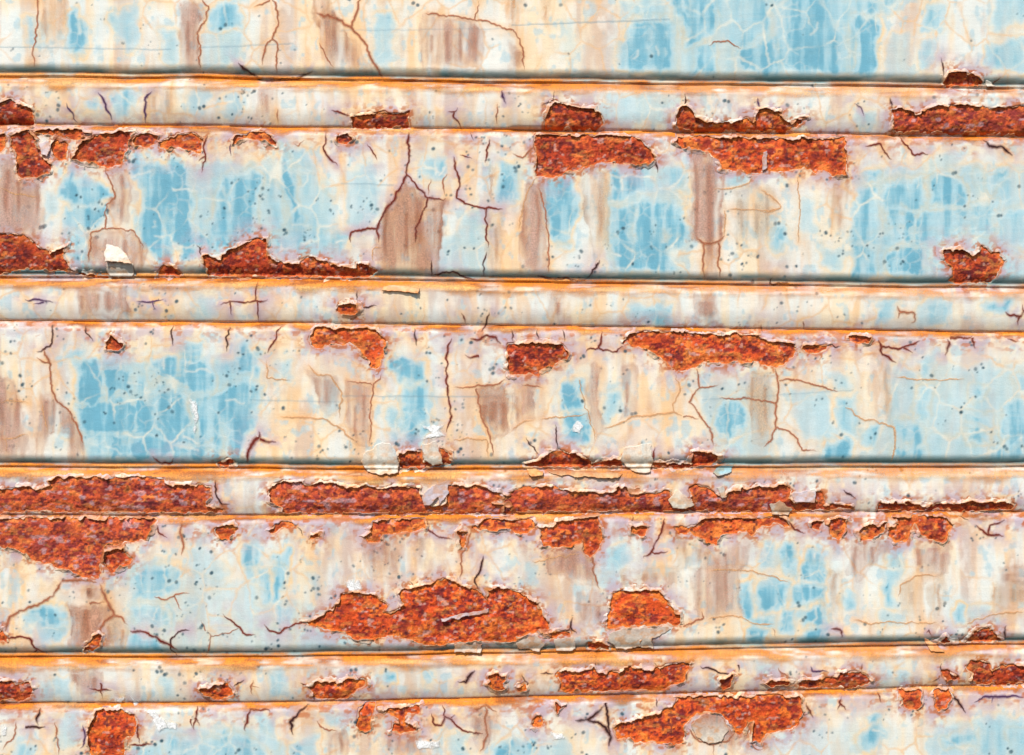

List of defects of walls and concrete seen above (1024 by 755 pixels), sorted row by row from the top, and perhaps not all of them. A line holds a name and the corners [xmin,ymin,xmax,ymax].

rust [91,124,424,134]
rust [447,128,813,137]
crack [349,92,599,281]
rust [0,185,802,332]
rust [768,329,1024,337]
crack [4,328,83,448]
crack [514,371,896,458]
rust [158,513,668,524]
peeling [265,440,1016,558]
rust [0,606,1024,686]
rust [0,701,336,711]
rust [376,694,664,707]